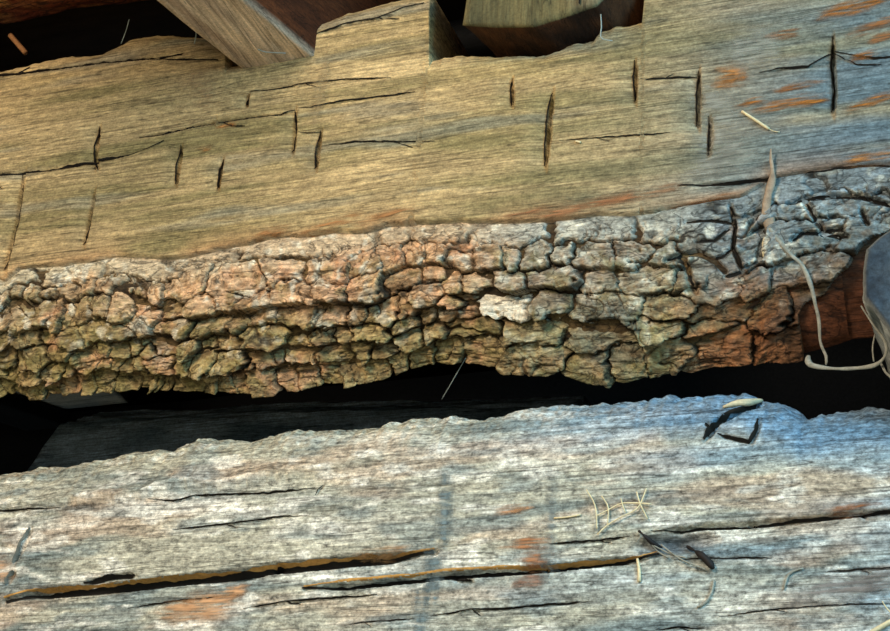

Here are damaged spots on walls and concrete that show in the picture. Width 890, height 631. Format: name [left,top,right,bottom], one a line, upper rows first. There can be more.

crack [0,53,218,77]
crack [759,51,890,73]
crack [0,77,430,189]
crack [148,486,322,502]
crack [4,510,890,609]
crack [347,601,588,627]
crack [655,603,890,631]